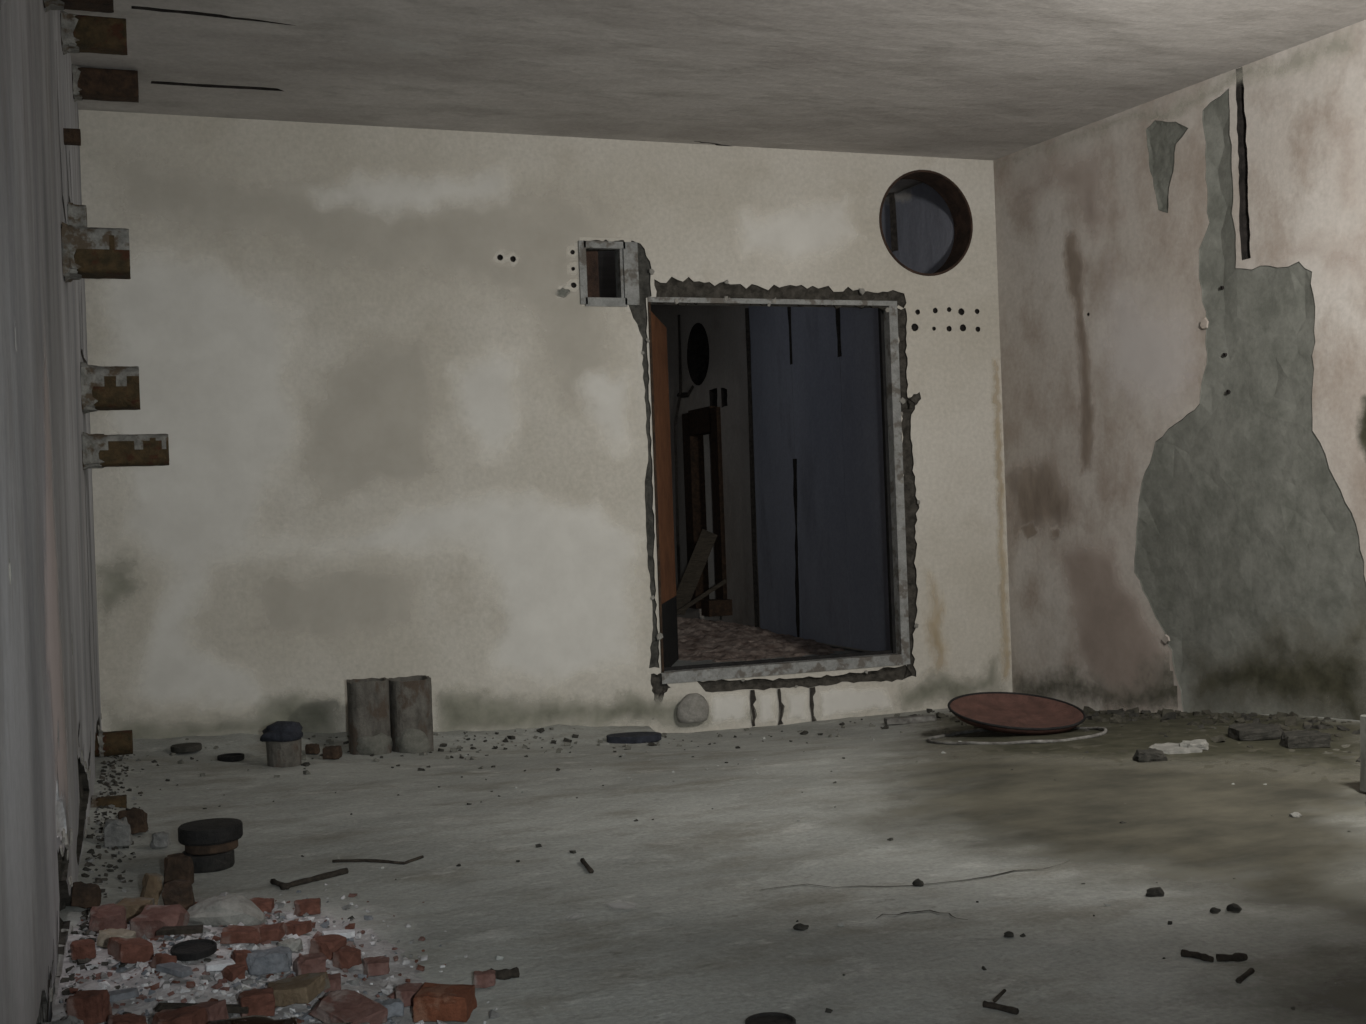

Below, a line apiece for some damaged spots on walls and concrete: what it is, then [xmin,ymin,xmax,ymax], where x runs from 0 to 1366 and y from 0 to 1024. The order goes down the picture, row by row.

spalling [1134,89,1366,719]
crack [750,687,816,726]
crack [42,914,59,1022]